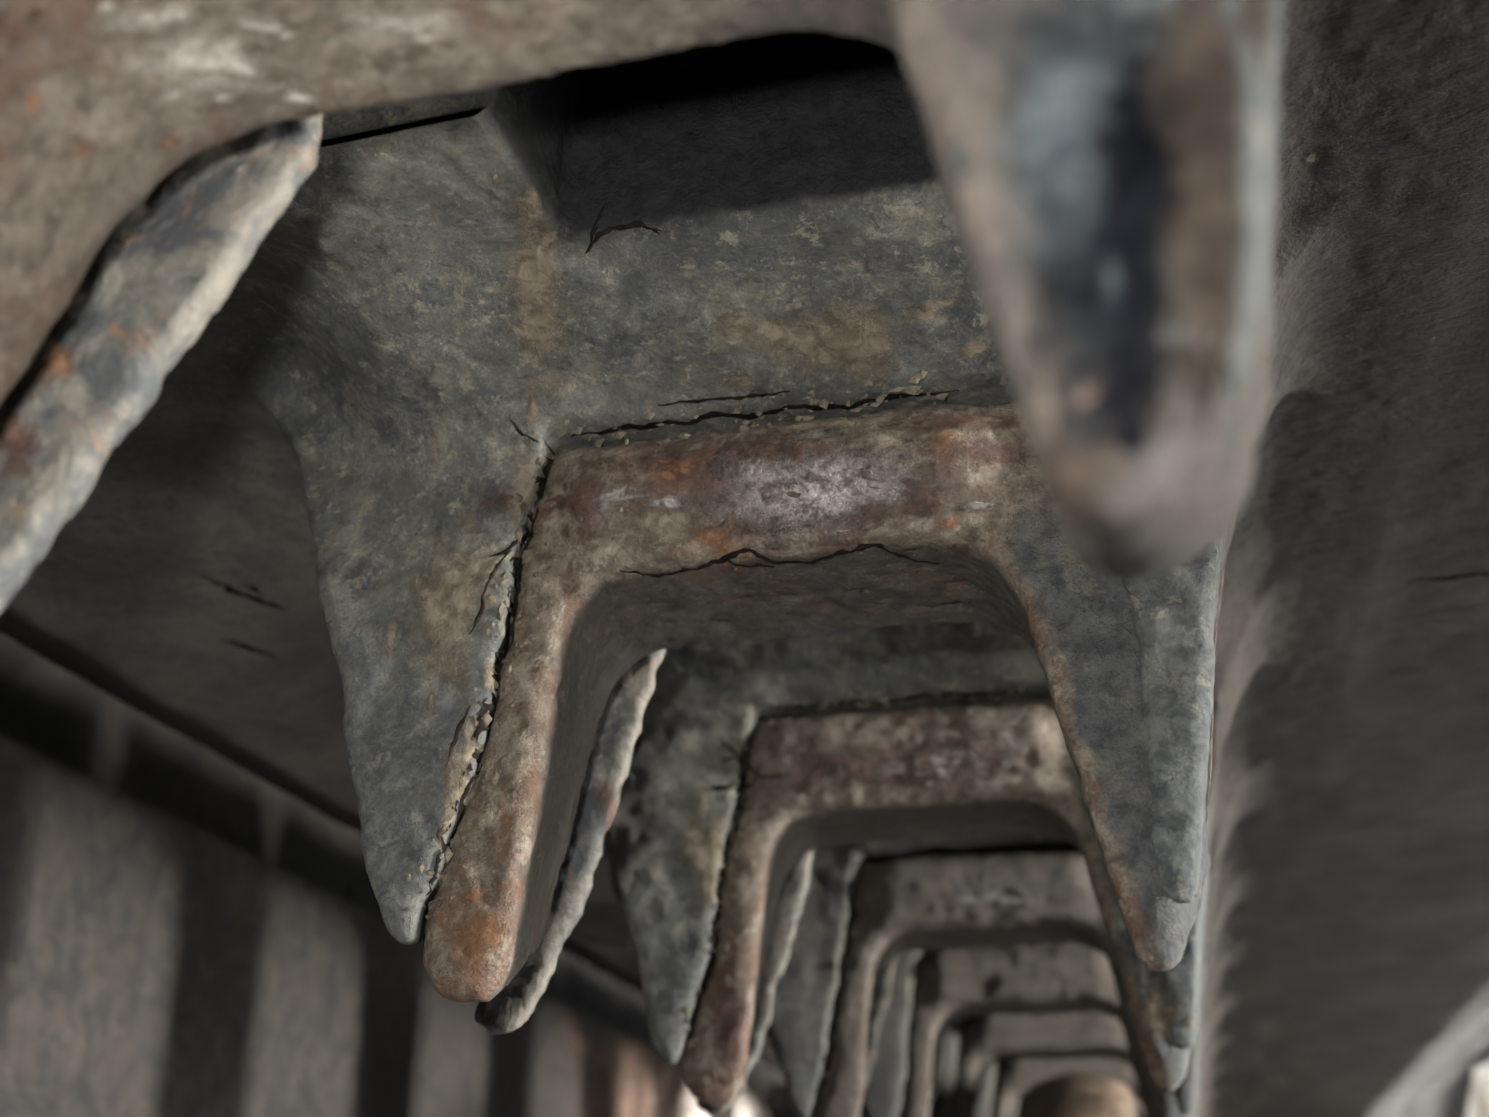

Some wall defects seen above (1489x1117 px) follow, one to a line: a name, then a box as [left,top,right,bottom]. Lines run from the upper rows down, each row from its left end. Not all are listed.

crack [585,206,661,254]
corrosion [0,412,37,475]
corrosion [900,413,1032,461]
corrosion [484,433,835,573]
corrosion [816,446,961,536]
crack [403,369,979,922]
corrosion [599,786,622,830]
crack [669,680,1034,1050]